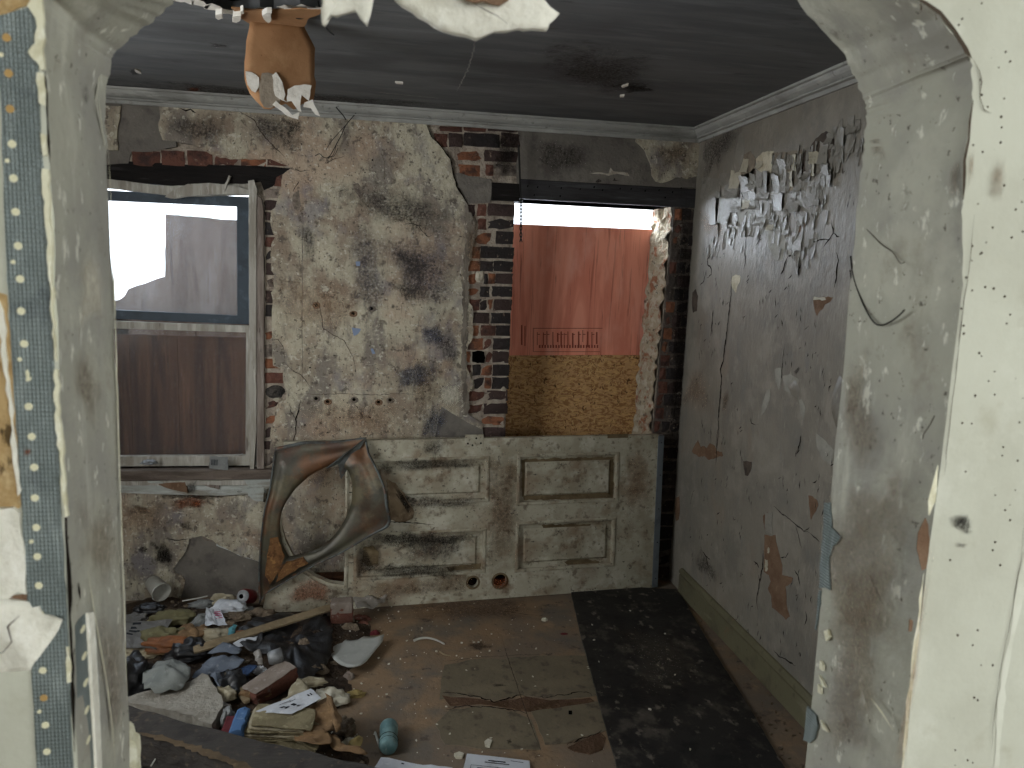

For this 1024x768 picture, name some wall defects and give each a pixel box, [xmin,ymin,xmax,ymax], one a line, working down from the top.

spalling [105,103,290,658]
spalling [427,125,845,580]
crack [700,186,790,457]
peeling [764,535,793,620]
spalling [916,518,930,570]